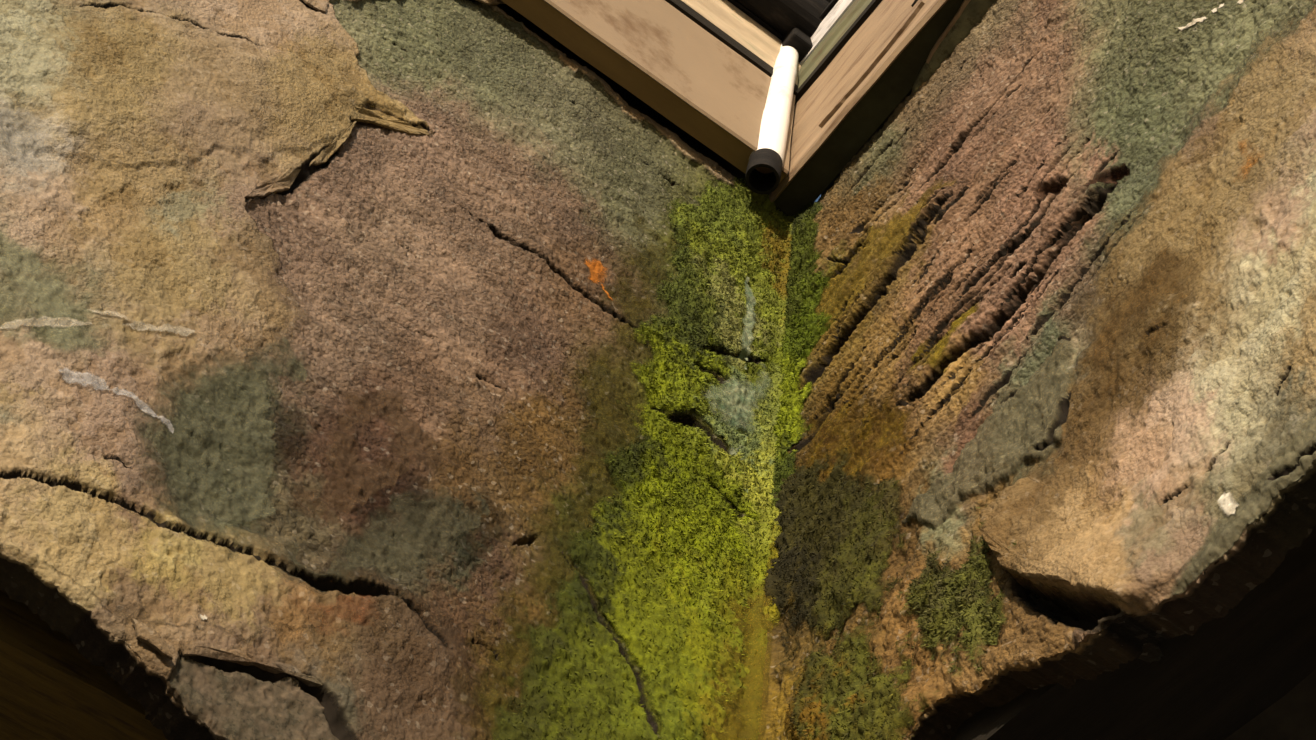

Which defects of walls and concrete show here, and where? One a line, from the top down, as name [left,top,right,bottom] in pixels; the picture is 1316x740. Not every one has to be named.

damp [1178,0,1244,30]
peeling [130,0,733,740]
corrosion [585,260,613,300]
peeling [693,345,769,382]
damp [705,277,767,493]
crack [790,128,961,453]
crack [895,164,1130,407]
peeling [745,0,1316,740]
crack [0,455,499,660]
peeling [707,478,750,517]
crack [178,652,359,740]
damp [704,593,773,740]